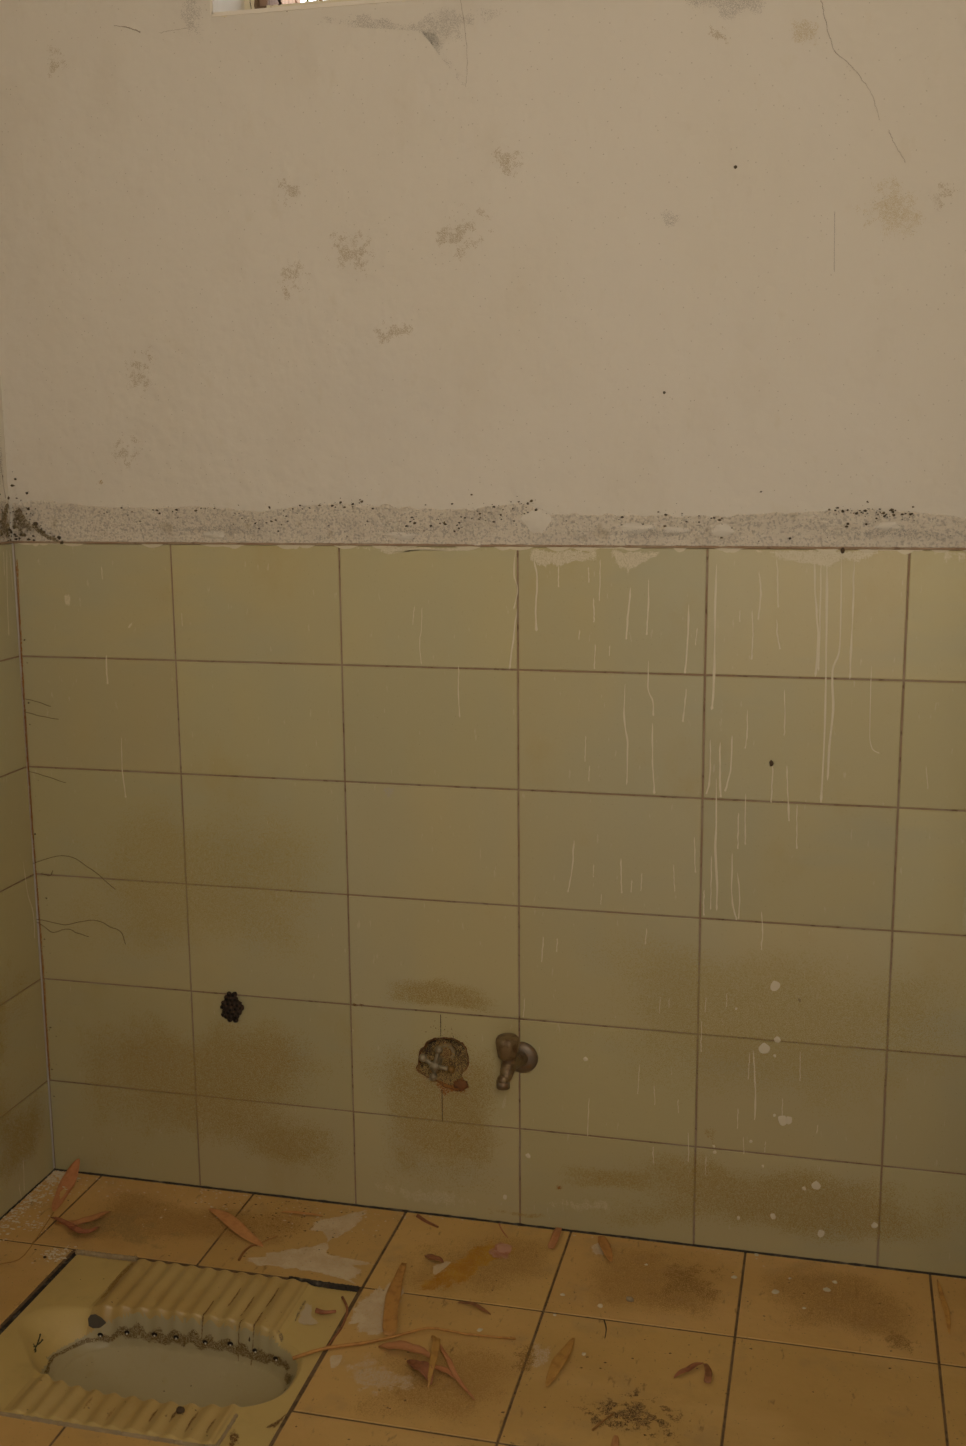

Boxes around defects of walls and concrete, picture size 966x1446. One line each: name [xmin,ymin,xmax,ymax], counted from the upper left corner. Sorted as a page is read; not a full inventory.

crack [820,0,905,161]